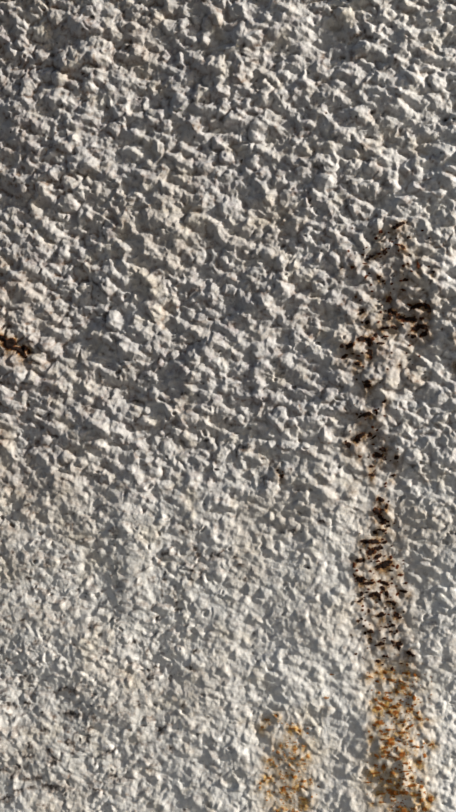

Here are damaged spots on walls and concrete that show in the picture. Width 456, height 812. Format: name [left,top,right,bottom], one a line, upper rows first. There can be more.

rust [0,333,31,361]
rust [340,221,435,393]
rust [345,400,399,481]
rust [352,497,435,812]
rust [259,714,319,812]